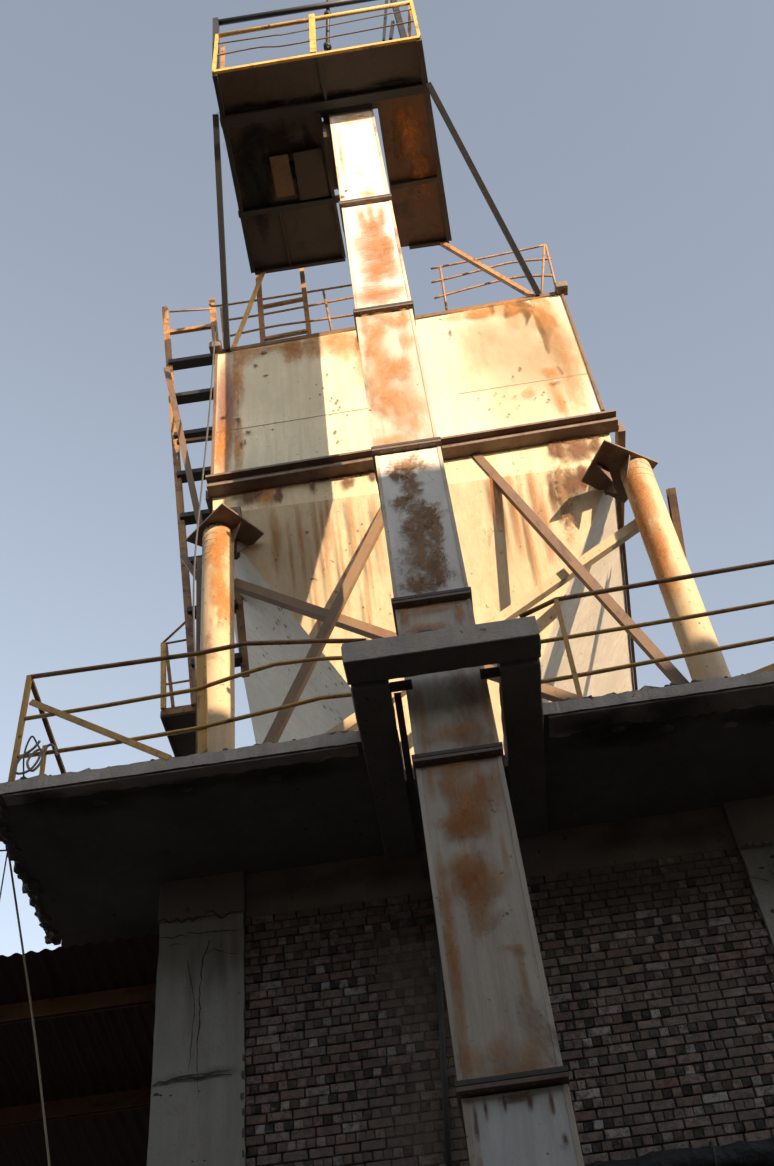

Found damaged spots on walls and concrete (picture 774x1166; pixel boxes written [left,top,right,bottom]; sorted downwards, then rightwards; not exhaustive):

corrosion [215,335,345,465]
corrosion [209,528,231,617]
corrosion [309,454,454,594]
corrosion [628,467,671,590]
crack [152,909,244,1098]